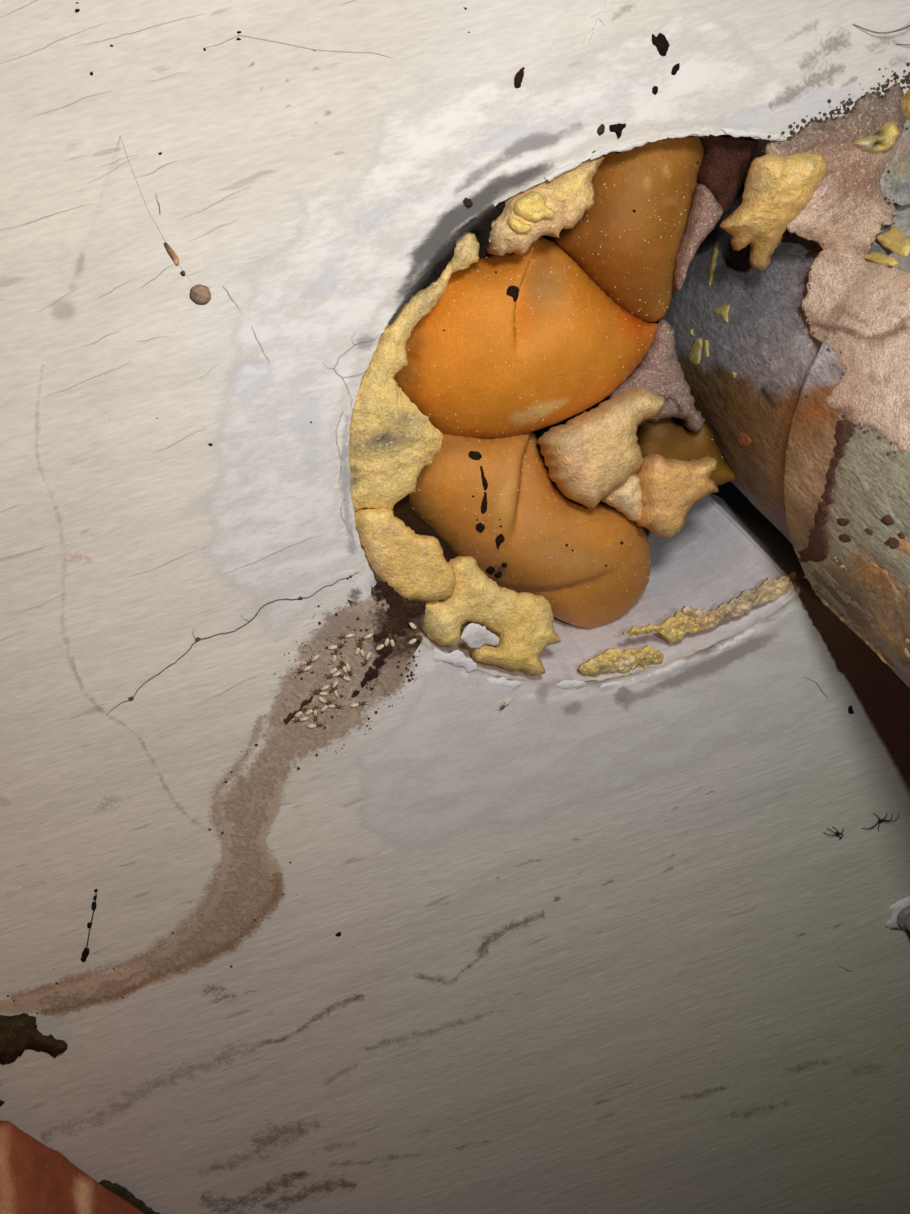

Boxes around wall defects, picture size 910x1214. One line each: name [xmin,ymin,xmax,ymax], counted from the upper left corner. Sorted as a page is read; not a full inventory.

crack [108,572,359,713]
corrosion [803,555,910,665]